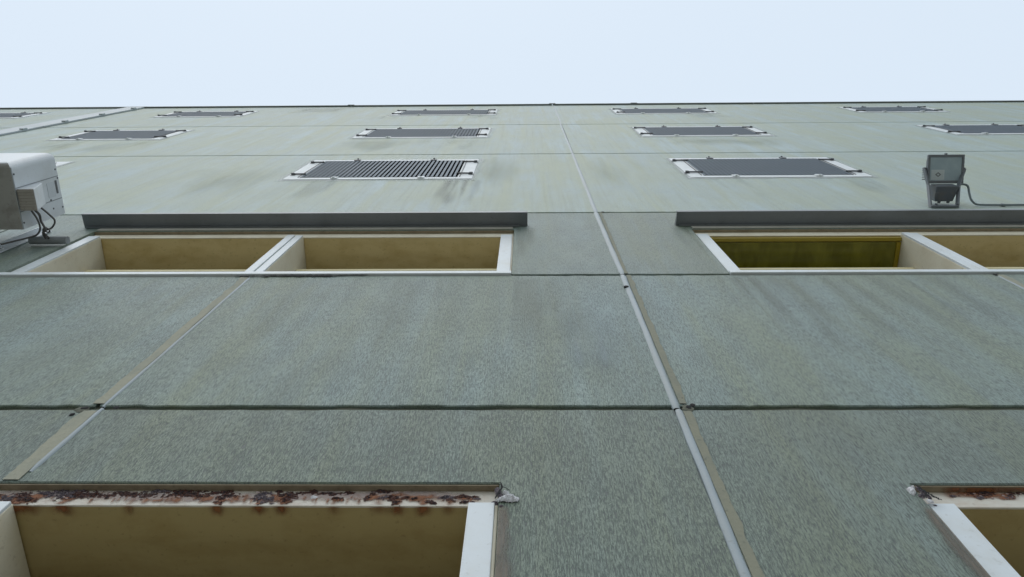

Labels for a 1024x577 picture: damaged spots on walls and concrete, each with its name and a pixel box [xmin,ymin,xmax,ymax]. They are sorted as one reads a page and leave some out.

rust [11,499,32,513]
rust [54,499,69,513]